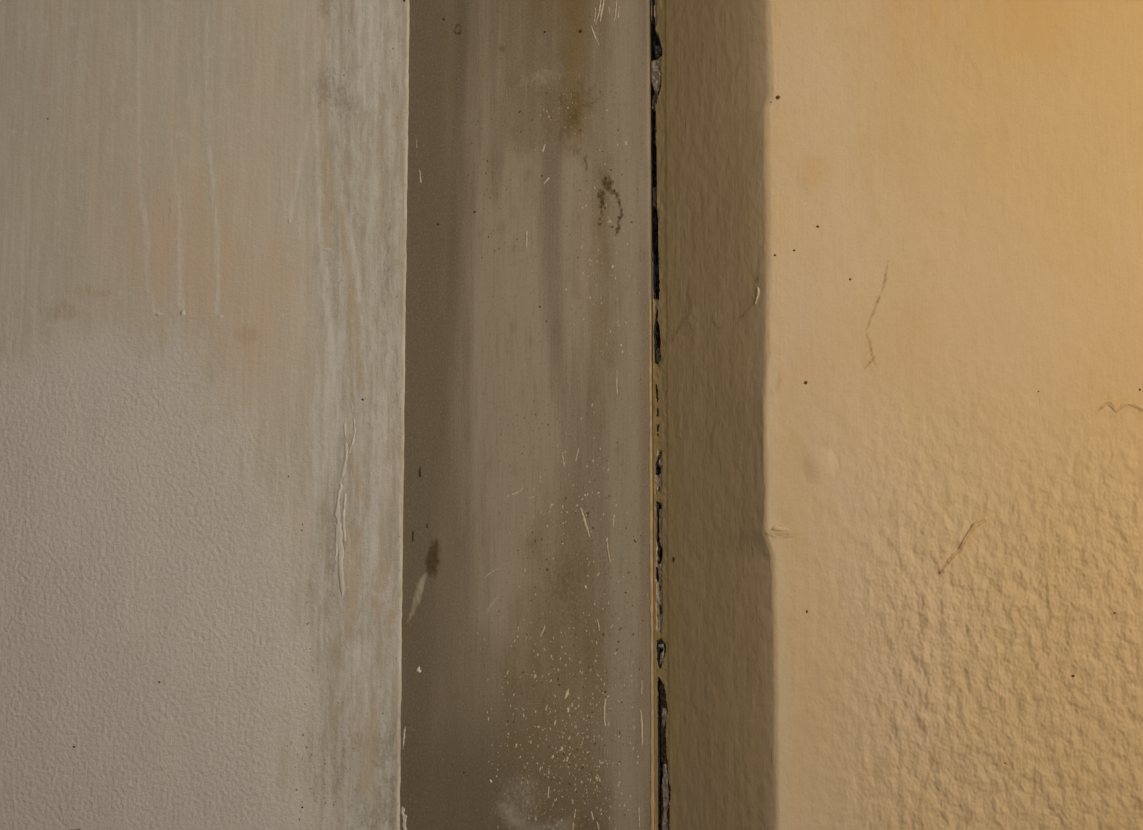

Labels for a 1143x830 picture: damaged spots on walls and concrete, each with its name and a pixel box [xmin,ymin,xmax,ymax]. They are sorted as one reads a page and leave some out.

damp [36,0,368,411]
crack [863,259,891,372]
crack [1099,401,1143,412]